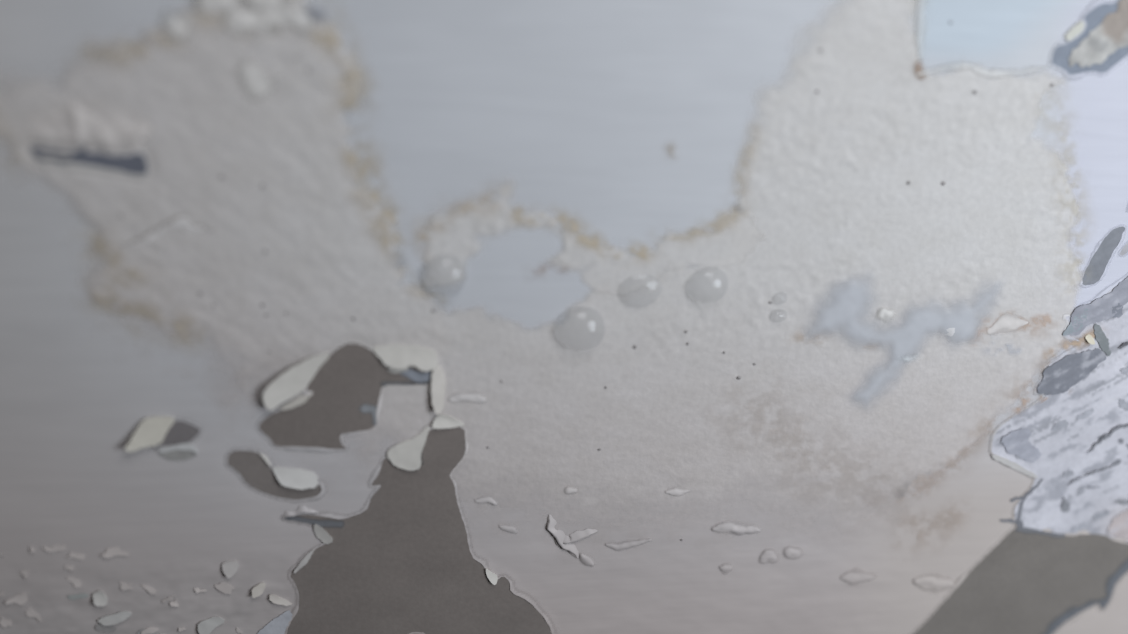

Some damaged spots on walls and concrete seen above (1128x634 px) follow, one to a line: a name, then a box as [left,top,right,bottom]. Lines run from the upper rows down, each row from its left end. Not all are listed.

peeling [1048,0,1128,79]
spalling [28,103,151,179]
damp [0,0,1081,514]
peeling [125,416,202,461]
peeling [225,342,556,634]
peeling [29,544,132,633]
peeling [911,526,1128,634]